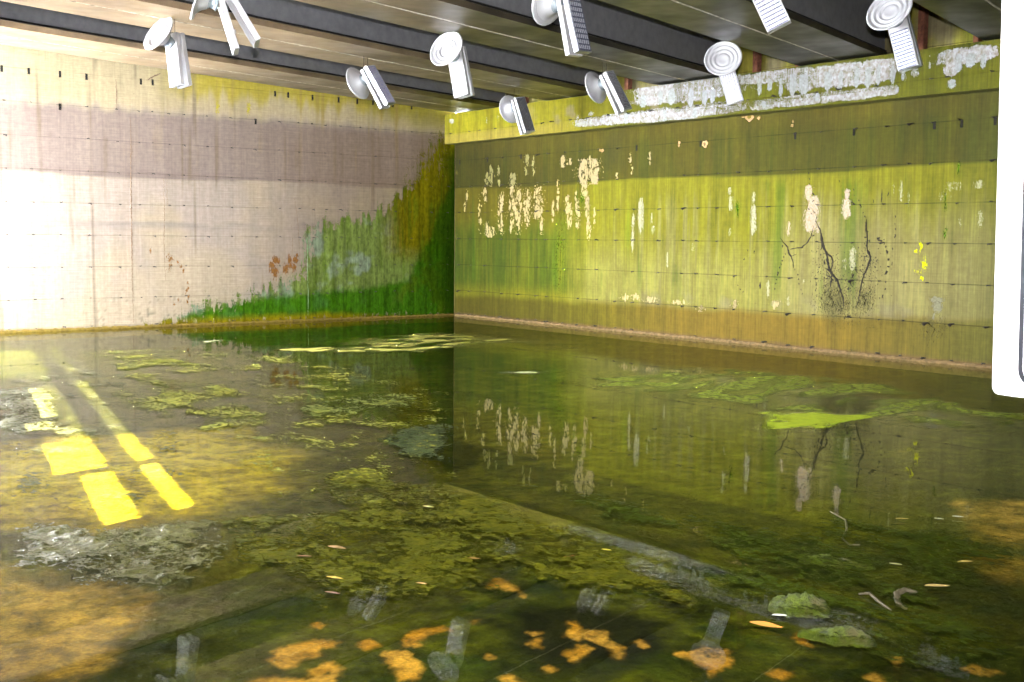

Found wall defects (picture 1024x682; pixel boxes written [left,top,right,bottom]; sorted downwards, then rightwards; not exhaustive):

peeling [464,149,618,239]
rust [269,253,298,281]
crack [740,172,896,319]
damp [812,274,875,329]